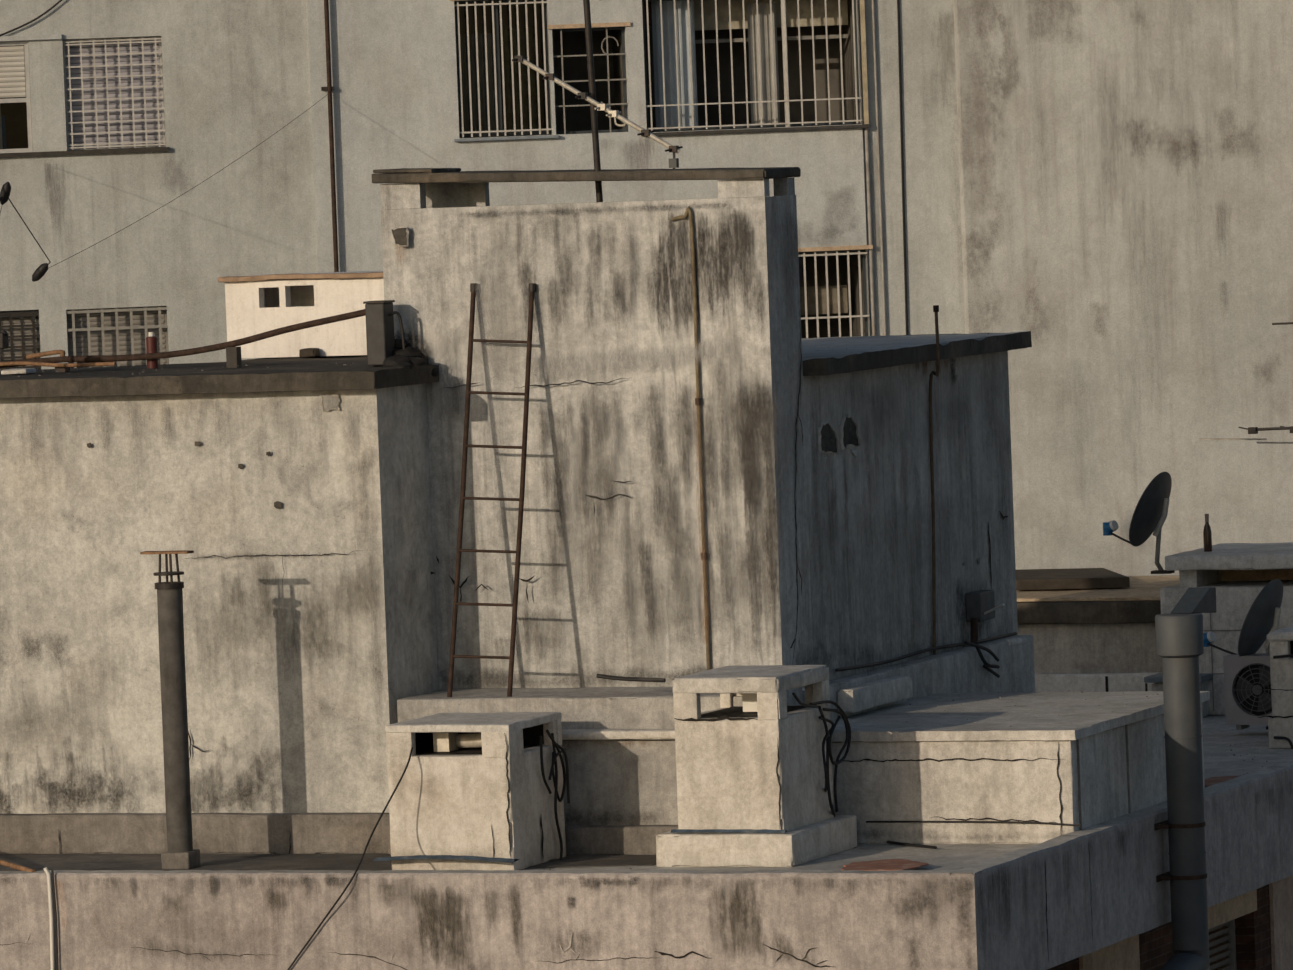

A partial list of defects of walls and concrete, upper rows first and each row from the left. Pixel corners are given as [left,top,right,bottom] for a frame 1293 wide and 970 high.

damp [657,219,750,325]
spalling [817,413,860,462]
damp [37,774,122,808]
crack [131,947,261,962]
crack [544,931,707,964]
crack [763,944,833,968]